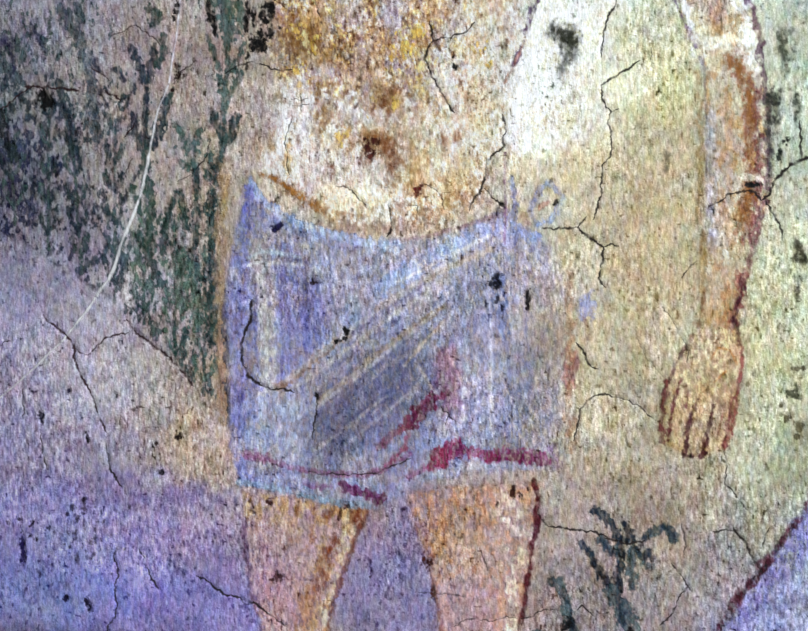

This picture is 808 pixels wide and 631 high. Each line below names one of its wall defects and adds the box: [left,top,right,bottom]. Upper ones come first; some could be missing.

crack [424,21,475,113]
crack [601,0,617,57]
crack [469,177,499,211]
crack [490,114,507,159]
crack [543,48,652,288]
crack [716,120,808,241]
crack [241,299,294,393]
crack [43,314,193,487]
crack [196,575,284,625]